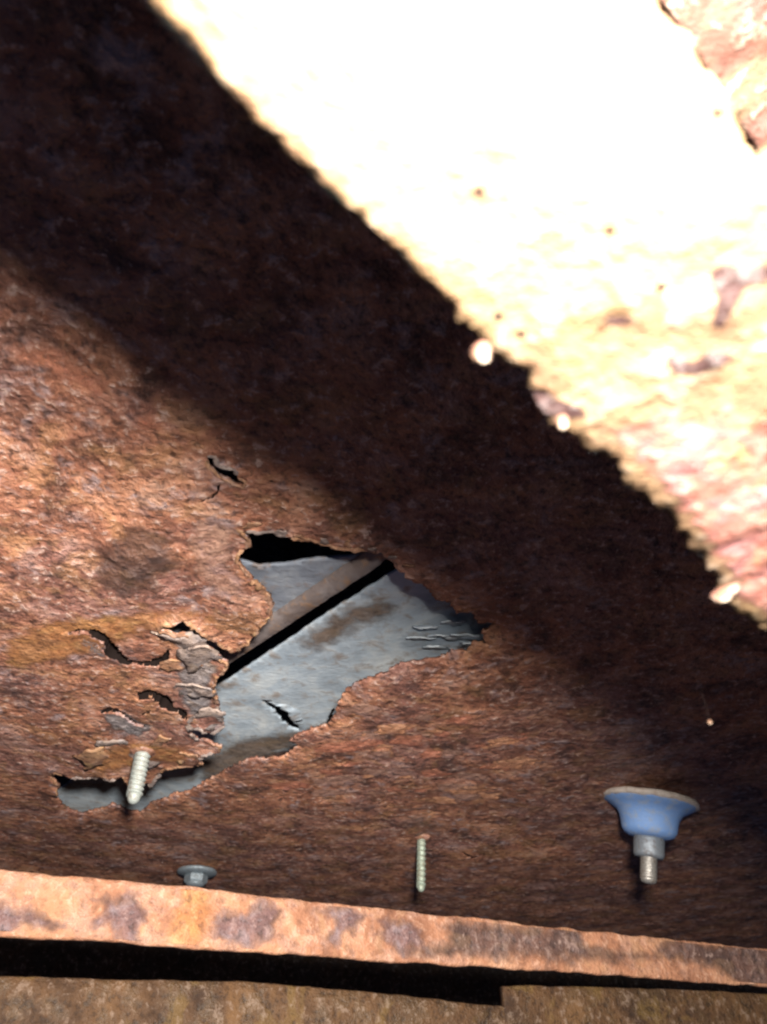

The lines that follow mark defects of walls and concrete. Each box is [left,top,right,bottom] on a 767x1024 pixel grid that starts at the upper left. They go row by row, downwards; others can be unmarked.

corrosion [709,262,767,328]
corrosion [667,351,734,375]
corrosion [535,392,586,419]
corrosion [613,411,767,611]
corrosion [98,528,175,595]
corrosion [304,603,391,646]
corrosion [8,613,226,733]
corrosion [72,713,298,779]
crack [269,702,335,728]
corrosion [268,702,555,813]
corrosion [95,894,146,941]
corrosion [169,889,279,948]